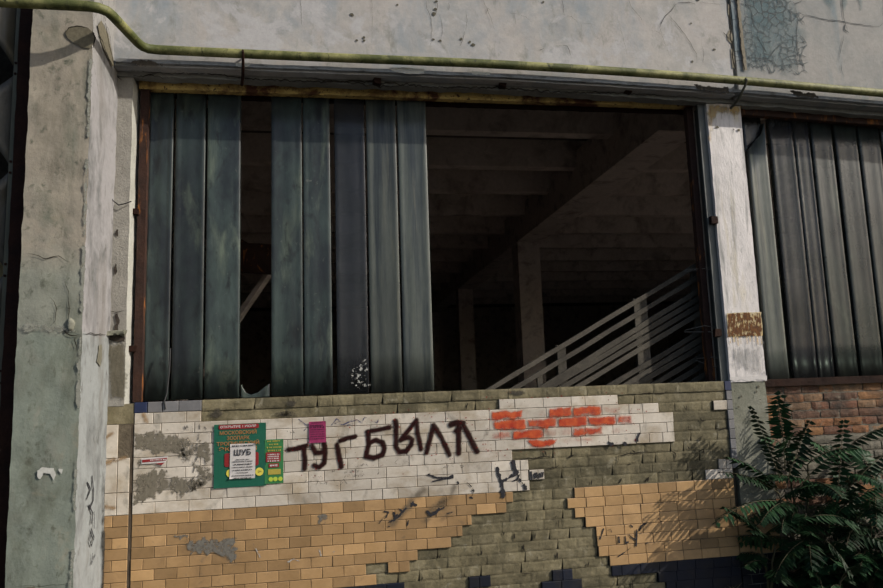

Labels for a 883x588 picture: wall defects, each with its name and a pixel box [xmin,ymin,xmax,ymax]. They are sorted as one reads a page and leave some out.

crack [632,2,713,60]
crack [740,0,883,74]
spalling [65,16,114,137]
rust [727,312,763,343]
peeling [37,467,63,480]
peeling [107,404,214,505]
peeling [202,359,767,588]
peeling [174,534,238,563]